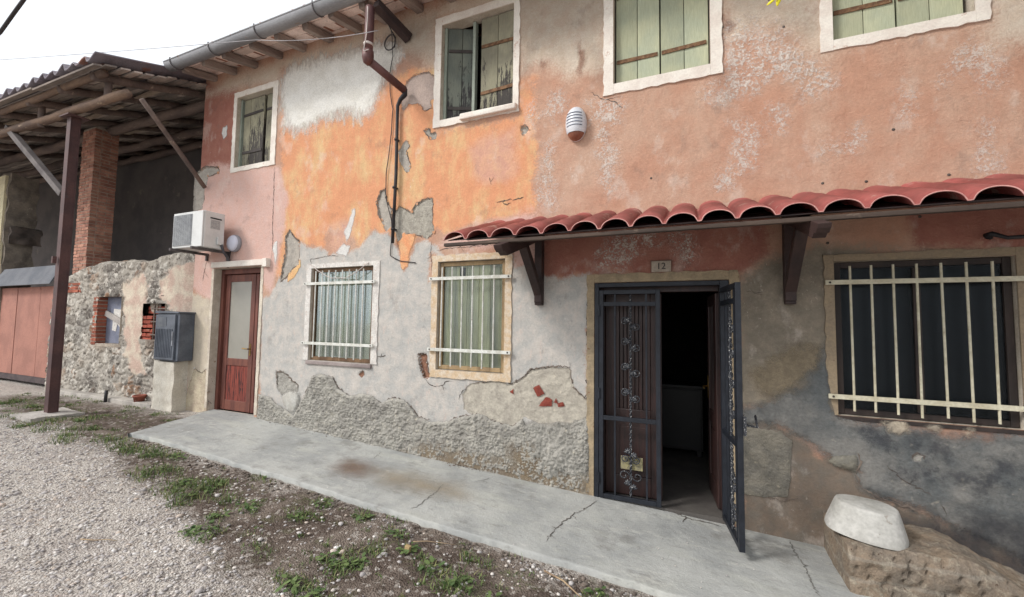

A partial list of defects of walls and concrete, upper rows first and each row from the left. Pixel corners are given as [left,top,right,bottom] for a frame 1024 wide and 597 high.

spalling [401,71,434,111]
spalling [398,140,411,173]
spalling [375,188,435,270]
spalling [280,229,301,283]
spalling [417,353,430,379]
spalling [256,365,589,495]
crack [547,502,594,540]
crack [790,542,819,595]